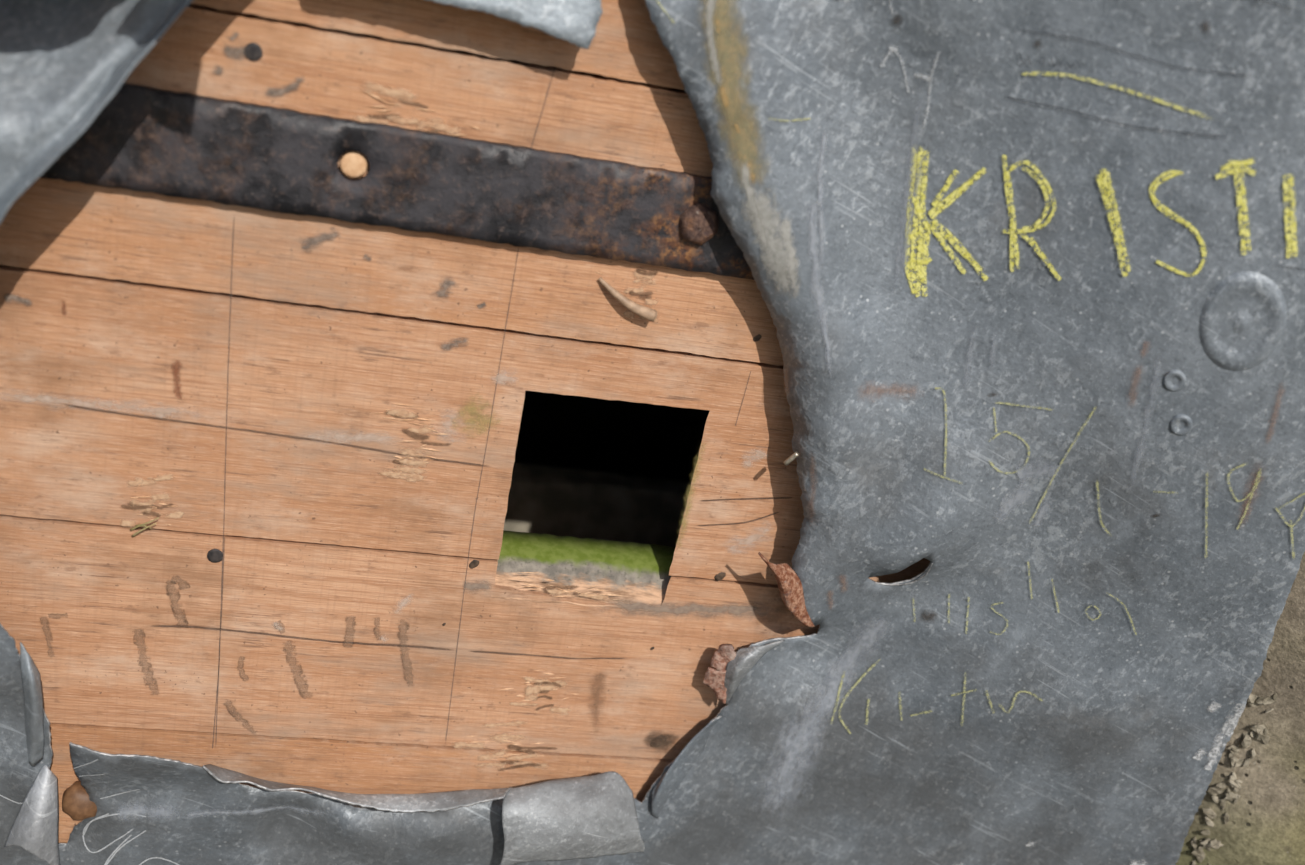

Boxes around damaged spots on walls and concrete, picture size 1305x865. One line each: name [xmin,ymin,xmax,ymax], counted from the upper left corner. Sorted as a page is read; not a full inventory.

spalling [215,33,245,75]
spalling [267,78,303,96]
peeling [355,82,459,134]
spalling [303,231,338,249]
spalling [436,279,455,297]
spalling [442,338,467,350]
spalling [172,361,182,398]
peeling [379,412,450,482]
peeling [121,474,184,526]
peeling [510,677,571,714]
efflorescence [1193,702,1245,770]
peeling [453,742,557,771]